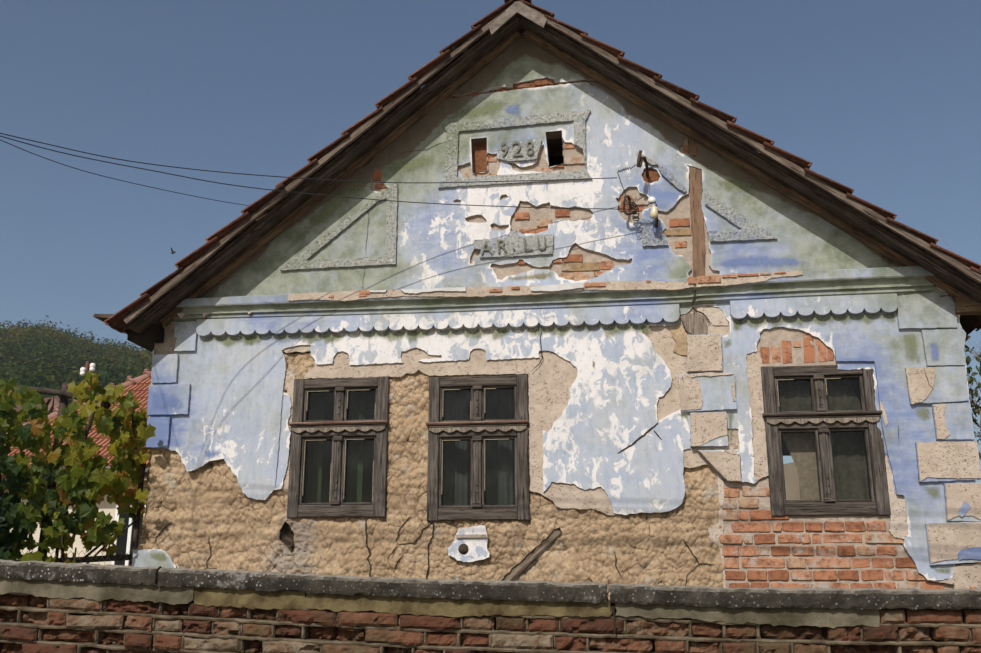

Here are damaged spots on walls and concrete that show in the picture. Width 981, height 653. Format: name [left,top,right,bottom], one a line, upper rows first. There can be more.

spalling [458,141,587,177]
spalling [288,166,803,302]
crack [618,422,662,453]
spalling [0,306,981,628]
crack [365,517,434,579]
crack [683,539,713,586]
spalling [85,631,124,653]
spalling [245,640,263,653]
spalling [309,626,337,639]
spalling [830,644,895,653]